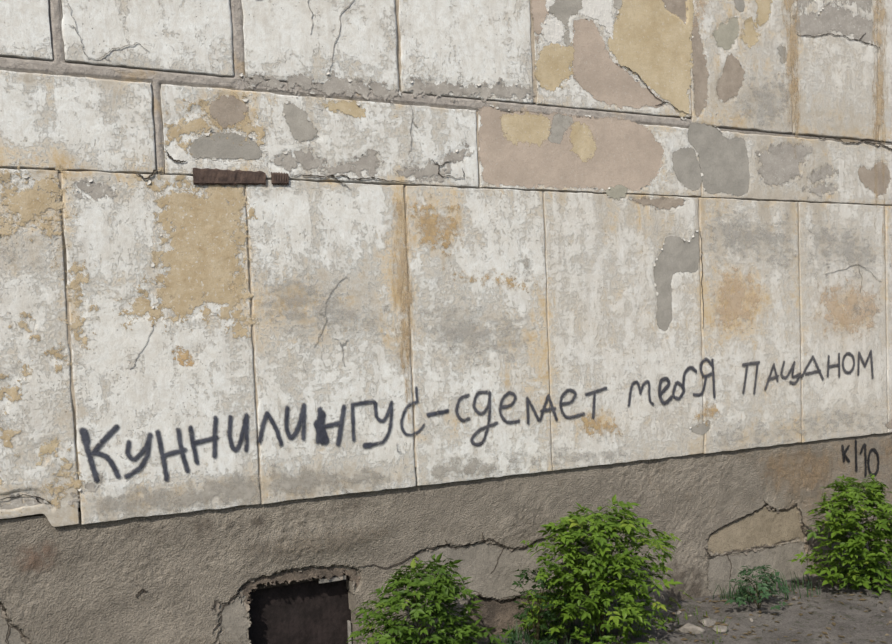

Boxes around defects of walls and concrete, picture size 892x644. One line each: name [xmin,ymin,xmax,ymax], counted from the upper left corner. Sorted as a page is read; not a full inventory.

spalling [792,0,879,47]
crack [797,33,880,48]
peeling [113,0,839,339]
crack [352,532,541,573]
spalling [707,505,810,595]
crack [474,590,531,601]
crack [0,602,30,644]